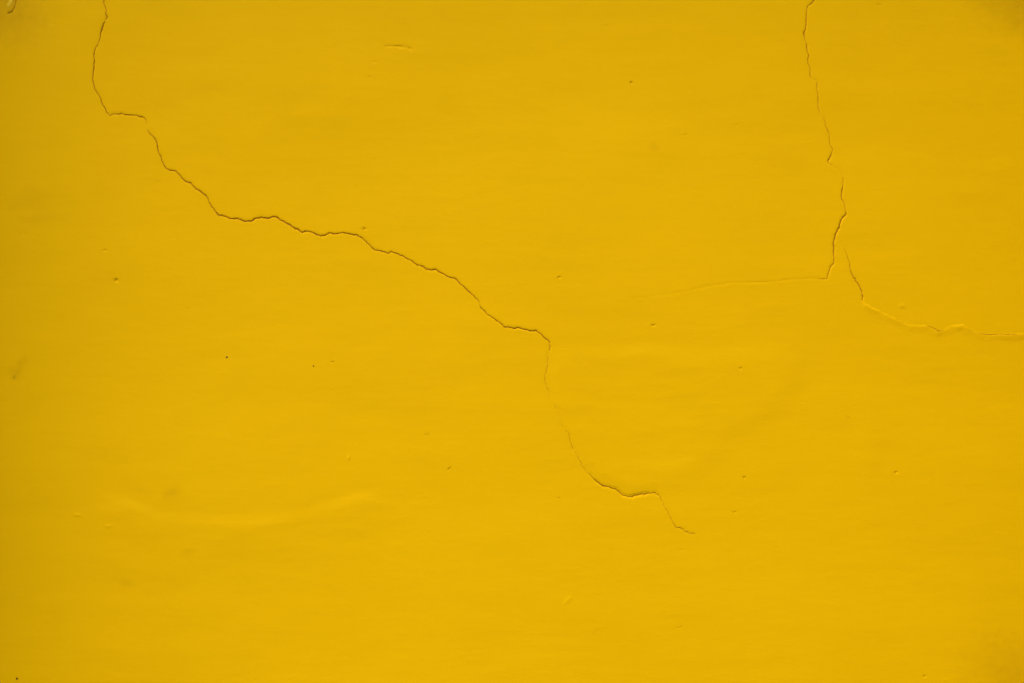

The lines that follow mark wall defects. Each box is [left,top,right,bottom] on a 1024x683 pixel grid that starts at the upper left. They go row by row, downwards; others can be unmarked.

crack [89,0,701,538]